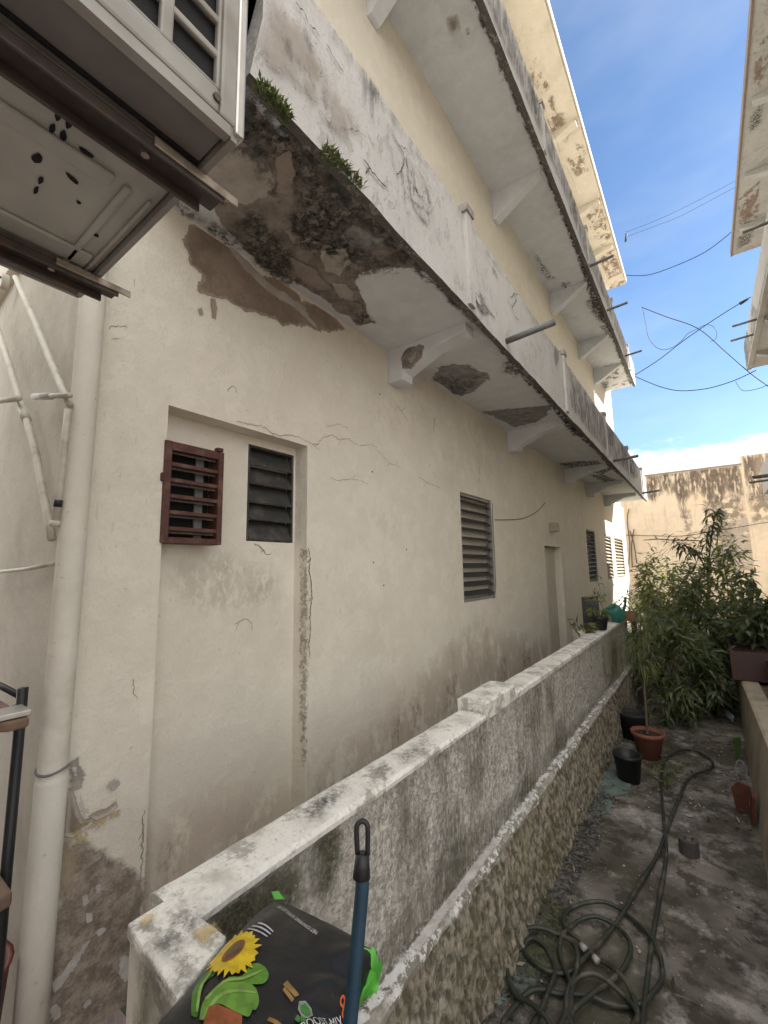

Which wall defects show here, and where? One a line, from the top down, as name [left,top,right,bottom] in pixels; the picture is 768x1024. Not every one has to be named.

leakage [207,214,300,284]
peeling [181,101,424,333]
leakage [234,89,477,326]
peeling [401,345,424,369]
crack [237,421,445,487]
leakage [640,455,768,537]
flaking render [49,757,145,1024]
mould [156,915,216,947]
leakage [481,792,608,1024]